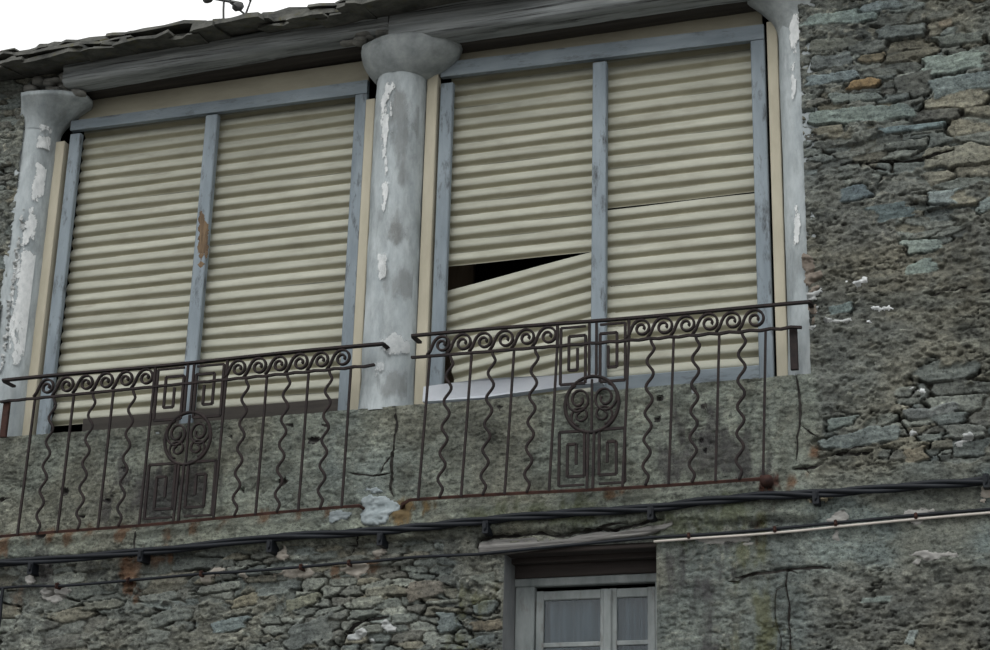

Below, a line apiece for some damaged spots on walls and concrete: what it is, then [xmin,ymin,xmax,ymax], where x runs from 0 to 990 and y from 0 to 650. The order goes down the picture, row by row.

peeling [789,13,800,99]
peeling [36,124,52,150]
peeling [380,82,395,212]
peeling [0,162,47,370]
peeling [377,254,387,280]
crack [349,409,398,497]
crack [795,374,870,473]
flaking render [329,487,400,526]
crack [728,566,828,650]